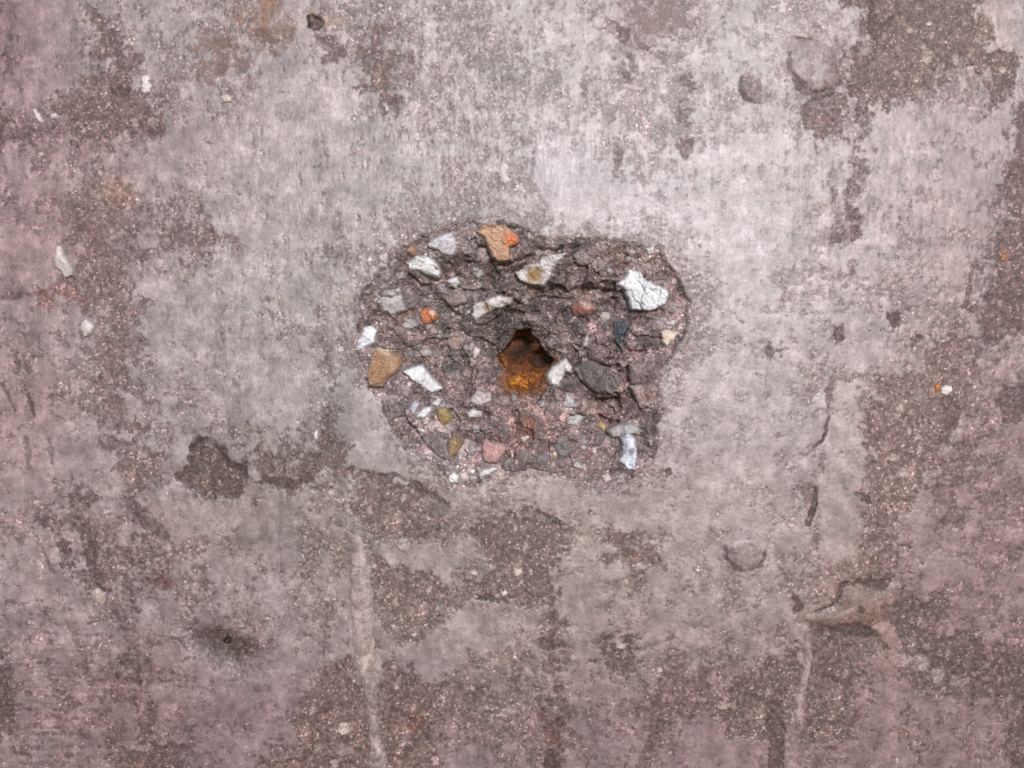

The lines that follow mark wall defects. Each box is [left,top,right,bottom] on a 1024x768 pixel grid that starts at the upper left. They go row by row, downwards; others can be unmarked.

spalling [353,217,691,489]
rust [496,330,558,398]
crack [813,416,830,448]
crack [801,487,817,526]